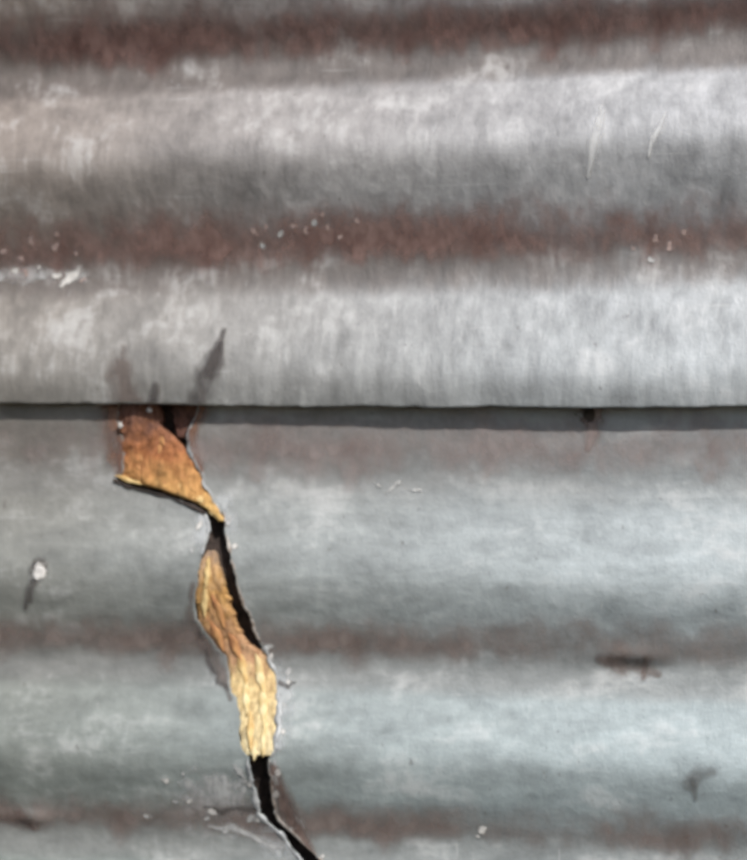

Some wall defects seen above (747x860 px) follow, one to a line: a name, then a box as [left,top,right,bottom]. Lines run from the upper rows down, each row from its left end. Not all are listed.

rust [0,210,554,267]
leakage [193,329,225,403]
spalling [105,404,224,522]
spalling [195,541,277,763]
crack [187,498,325,860]
peeling [173,765,254,834]